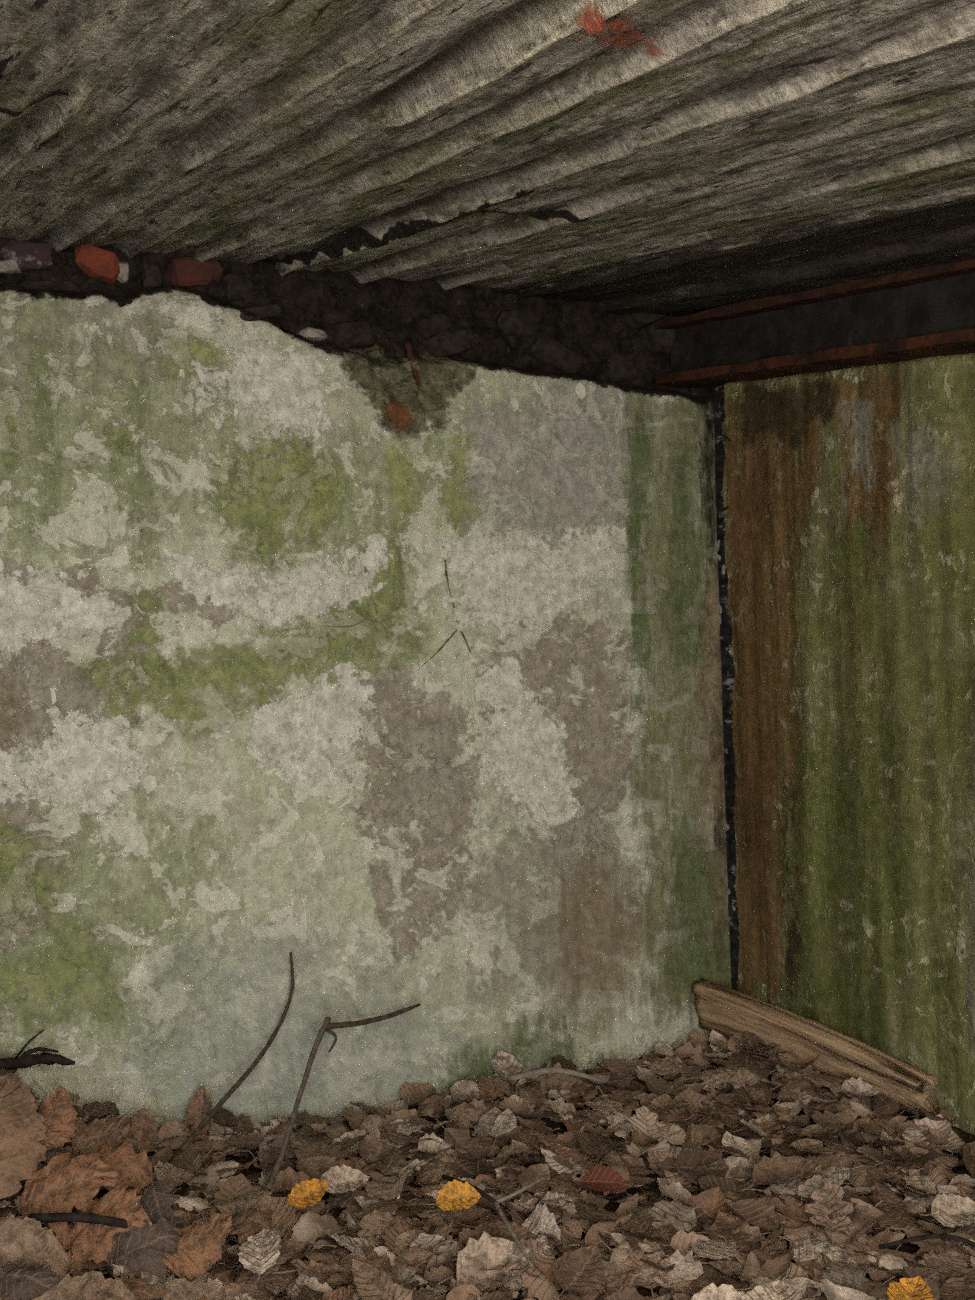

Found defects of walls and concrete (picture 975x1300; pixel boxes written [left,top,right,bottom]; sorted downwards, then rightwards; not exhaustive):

leakage [1,347,60,522]
leakage [127,593,174,688]
leakage [355,540,403,653]
leakage [628,421,649,667]
leakage [668,446,732,1002]
corrosion [722,367,900,1002]
leakage [136,940,438,1122]